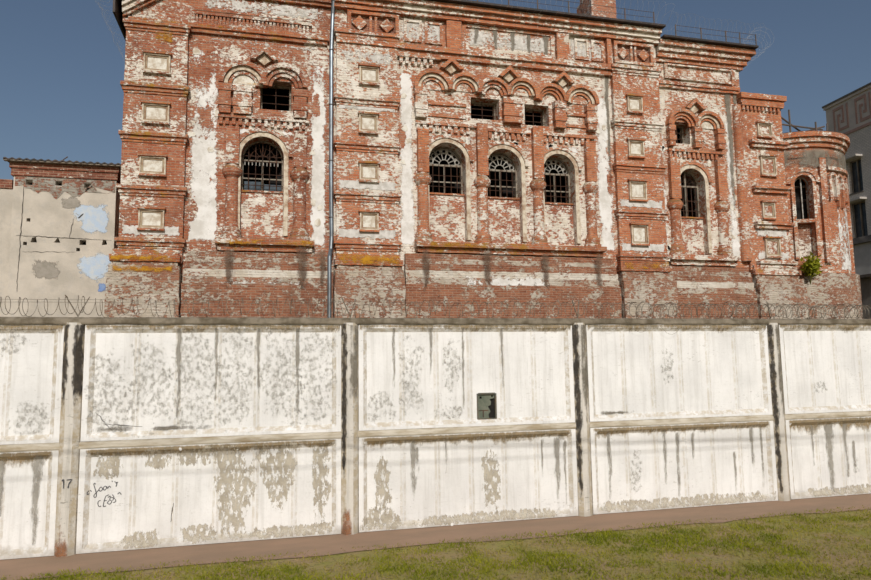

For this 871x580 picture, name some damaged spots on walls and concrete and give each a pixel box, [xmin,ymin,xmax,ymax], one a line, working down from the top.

peeling [204,0,324,19]
peeling [468,29,548,53]
peeling [122,196,198,236]
damp [225,249,234,285]
damp [296,247,326,289]
damp [71,324,340,414]
damp [350,325,871,407]
damp [32,456,44,542]
peeling [144,442,334,544]
peeling [362,456,401,531]
peeling [414,449,562,526]
damp [824,424,856,491]